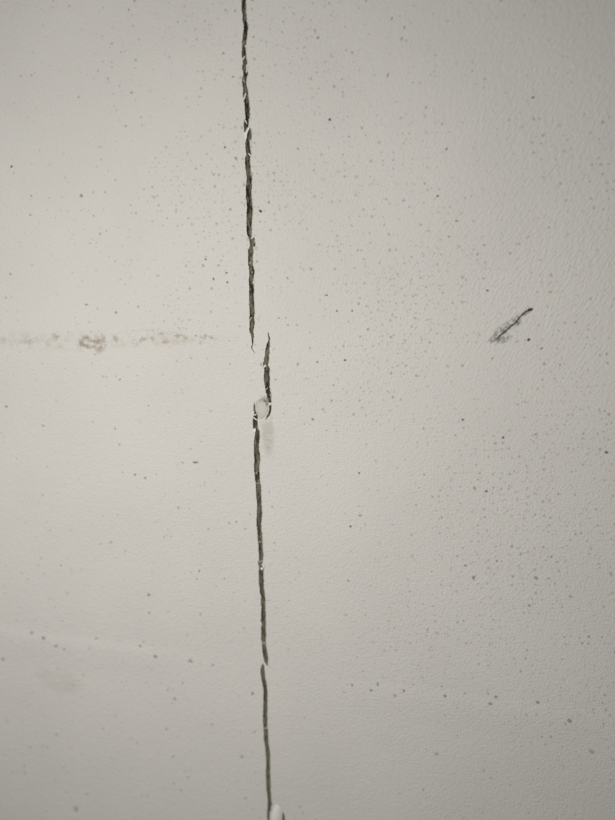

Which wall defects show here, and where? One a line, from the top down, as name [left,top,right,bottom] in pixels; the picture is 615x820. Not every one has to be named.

crack [241,0,286,820]